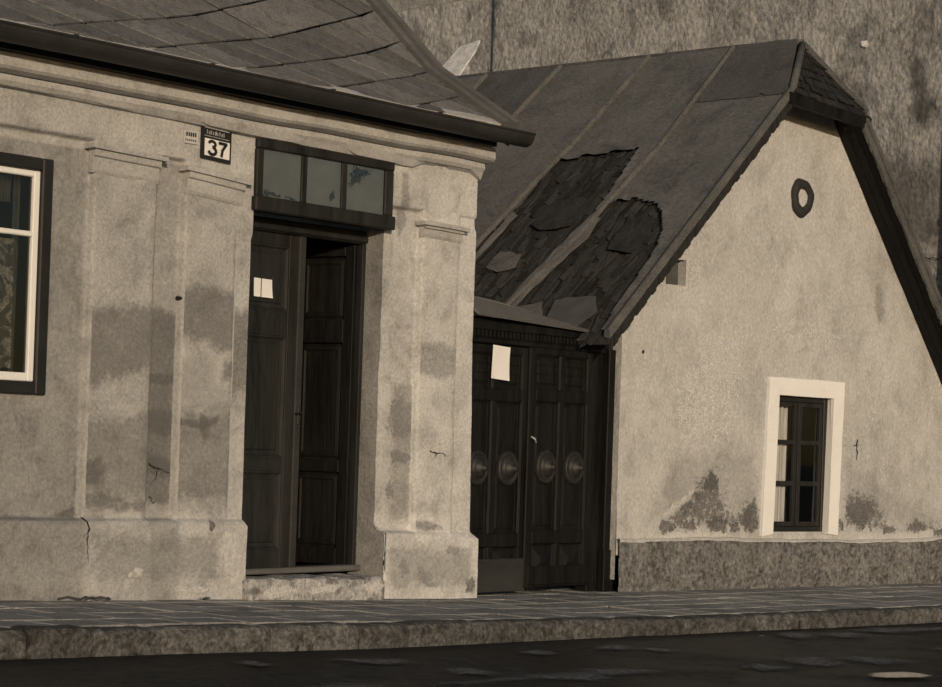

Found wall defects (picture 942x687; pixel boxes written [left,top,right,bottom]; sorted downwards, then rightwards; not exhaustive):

leakage [90,288,248,502]
crack [148,462,170,504]
peeling [650,466,759,538]
peeling [839,489,942,536]